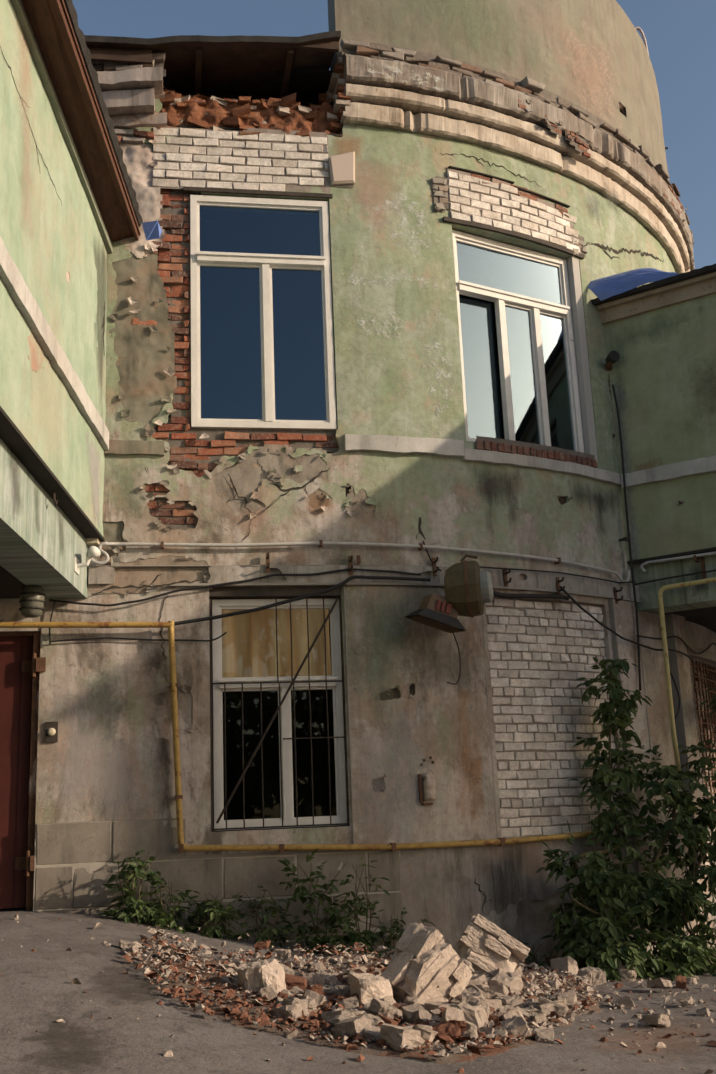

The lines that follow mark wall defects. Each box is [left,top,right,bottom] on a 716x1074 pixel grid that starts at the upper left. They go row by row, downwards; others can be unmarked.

crack [0,47,62,204]
spalling [543,115,591,159]
crack [440,153,542,187]
spalling [431,176,449,212]
spalling [570,234,588,257]
crack [585,242,664,262]
flaking render [108,139,339,531]
crack [226,468,330,541]
flaking render [345,483,378,525]
hole [378,684,415,701]